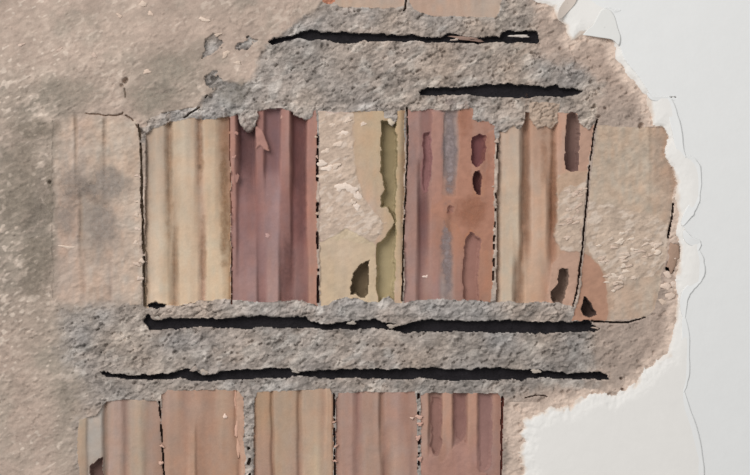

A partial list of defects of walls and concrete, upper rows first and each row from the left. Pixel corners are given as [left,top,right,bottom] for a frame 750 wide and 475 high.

crack [268,29,539,45]
spalling [469,133,488,198]
spalling [562,110,583,173]
crack [85,82,646,335]
spalling [349,118,400,302]
spalling [461,230,483,301]
spalling [549,267,571,304]
spalling [579,295,599,320]
peeling [596,155,705,475]
spalling [88,455,106,475]
crack [101,365,609,475]
spalling [427,393,494,473]